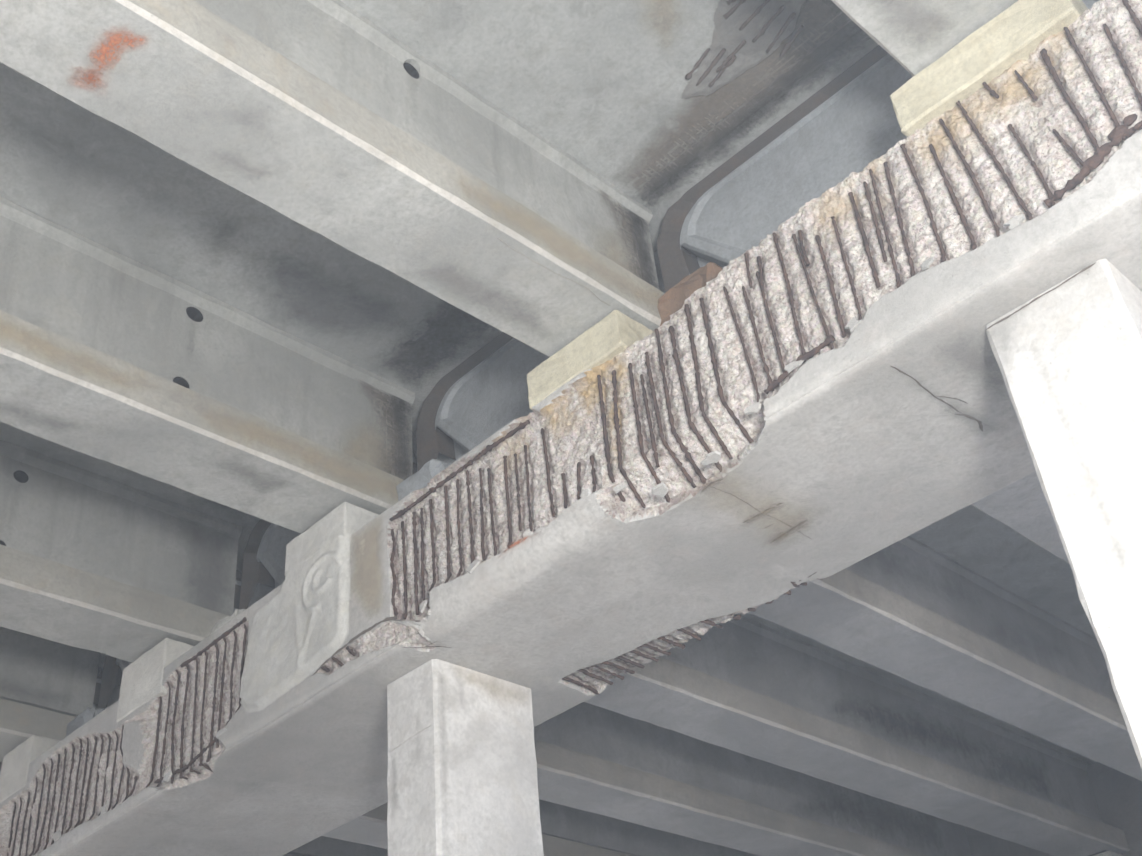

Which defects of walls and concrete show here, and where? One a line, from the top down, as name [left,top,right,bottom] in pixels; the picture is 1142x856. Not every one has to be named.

rust [79,33,144,87]
rust [632,0,866,204]
spalling [318,0,1142,675]
crack [891,366,983,432]
spalling [562,570,823,695]
spalling [0,617,249,856]